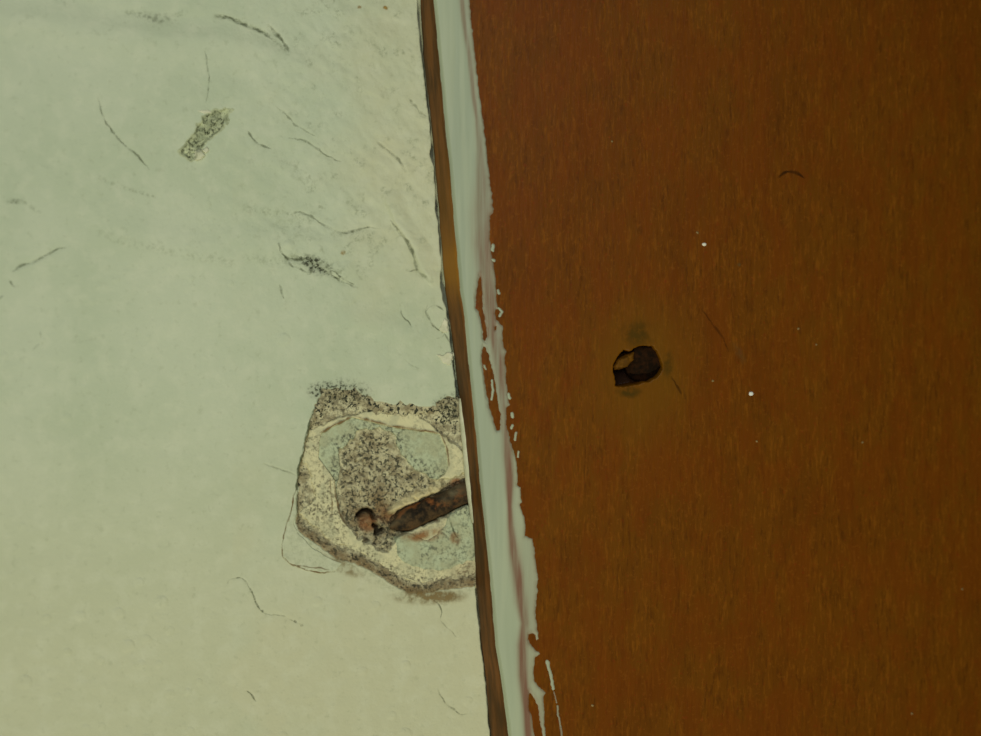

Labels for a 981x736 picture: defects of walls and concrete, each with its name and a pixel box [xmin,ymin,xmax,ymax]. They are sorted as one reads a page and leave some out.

spalling [177,107,234,162]
spalling [281,387,476,594]
rust [389,481,468,540]